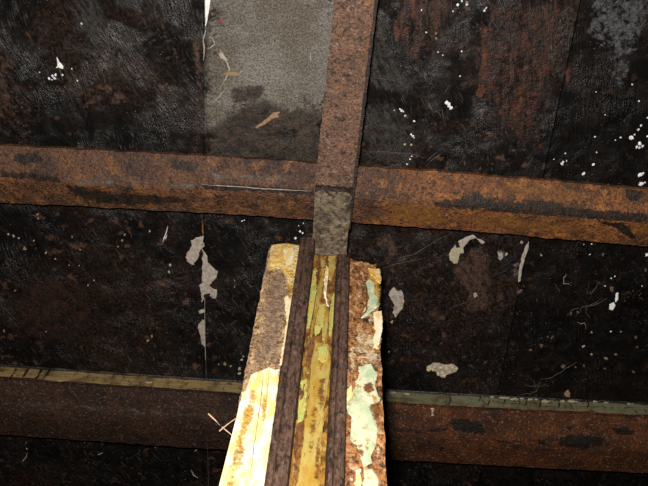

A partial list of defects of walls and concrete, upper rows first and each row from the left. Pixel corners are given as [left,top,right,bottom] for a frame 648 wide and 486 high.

rust [14,153,44,165]
rust [66,185,186,206]
damp [208,82,322,162]
rust [434,192,648,240]
peeling [186,220,218,362]
spalling [449,235,493,313]
peeling [514,240,529,294]
peeling [219,223,304,486]
peeling [346,266,404,486]